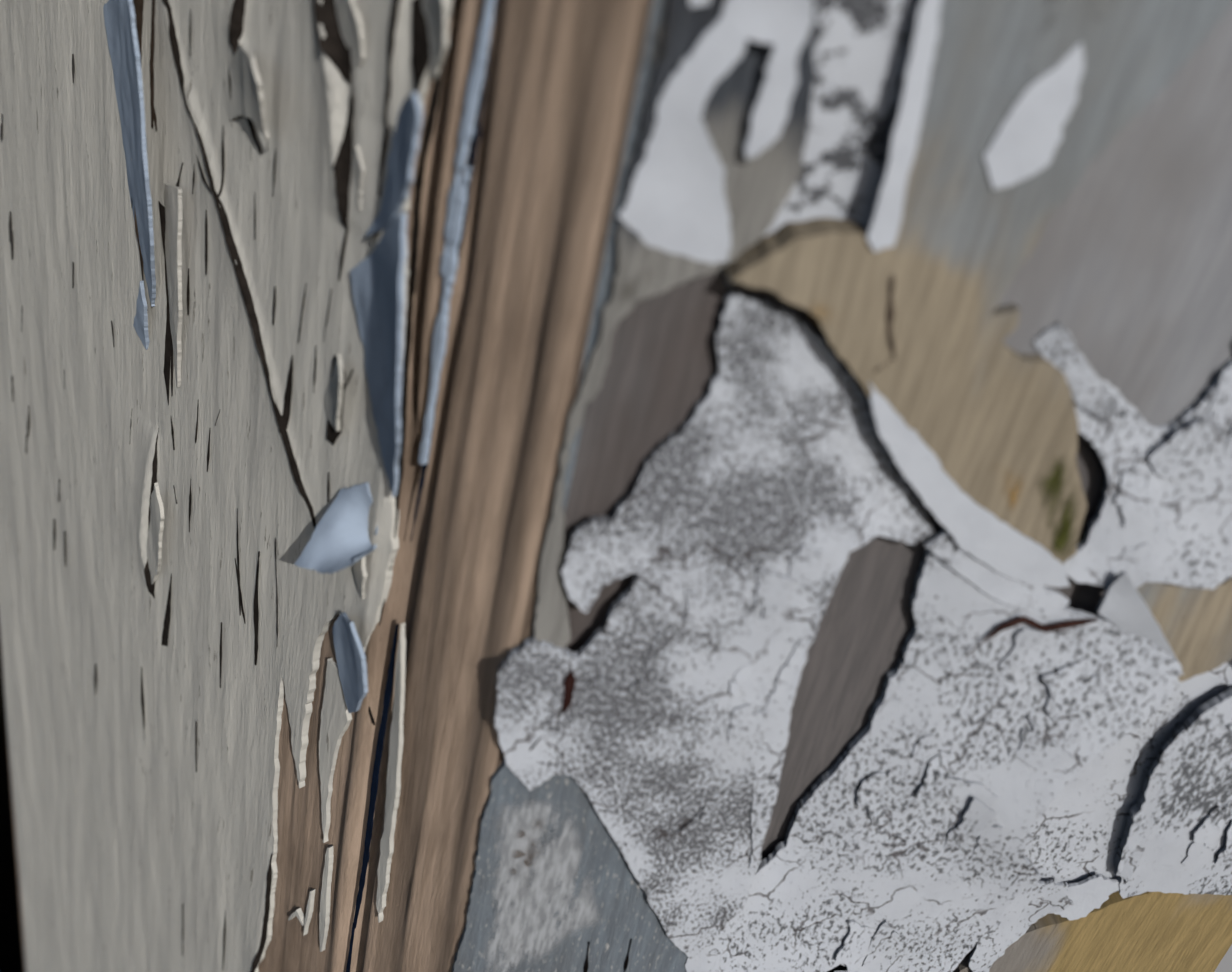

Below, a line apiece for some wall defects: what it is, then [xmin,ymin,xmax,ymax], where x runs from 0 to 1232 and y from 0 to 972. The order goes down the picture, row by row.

crack [133,0,316,646]
peeling [488,0,1232,972]